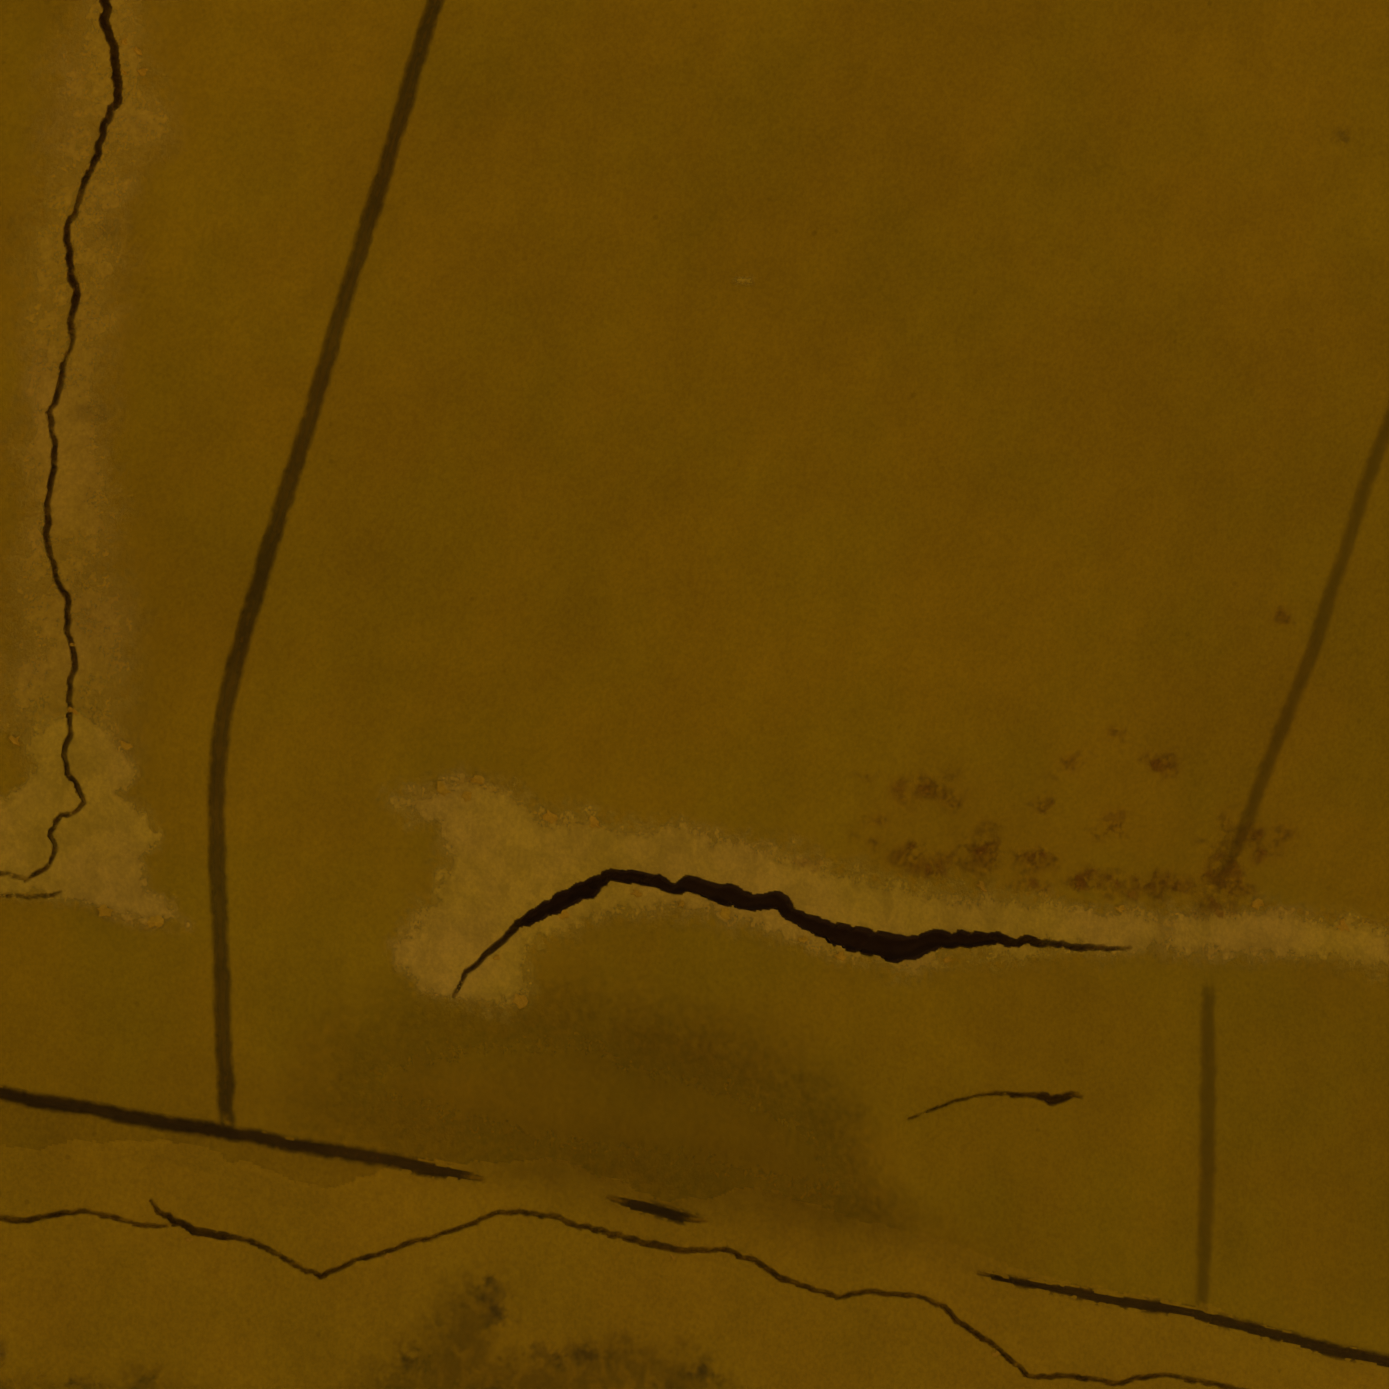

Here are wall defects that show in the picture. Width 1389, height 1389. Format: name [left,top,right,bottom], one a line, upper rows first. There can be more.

crack [0,0,128,876]
crack [457,869,1117,989]
crack [1008,1092,1072,1104]
crack [10,1210,117,1222]
crack [165,1214,289,1262]
crack [318,1211,678,1278]
crack [726,1249,834,1297]
crack [896,1293,1177,1381]